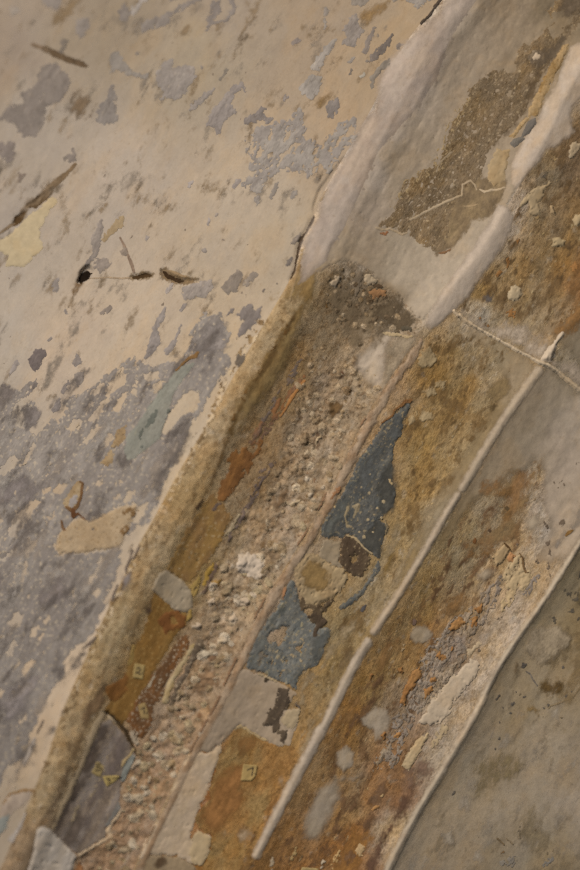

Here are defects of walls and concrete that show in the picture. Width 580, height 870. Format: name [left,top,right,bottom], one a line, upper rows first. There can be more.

peeling [0,63,71,162]
peeling [109,51,358,206]
water stain [195,272,315,542]
crack [289,189,328,301]
crack [420,0,441,24]
crack [375,179,505,236]
water stain [404,211,580,463]
crack [105,712,138,756]
peeling [51,593,210,858]
peeling [0,304,262,784]
peeling [246,403,410,744]
peeling [373,543,541,772]